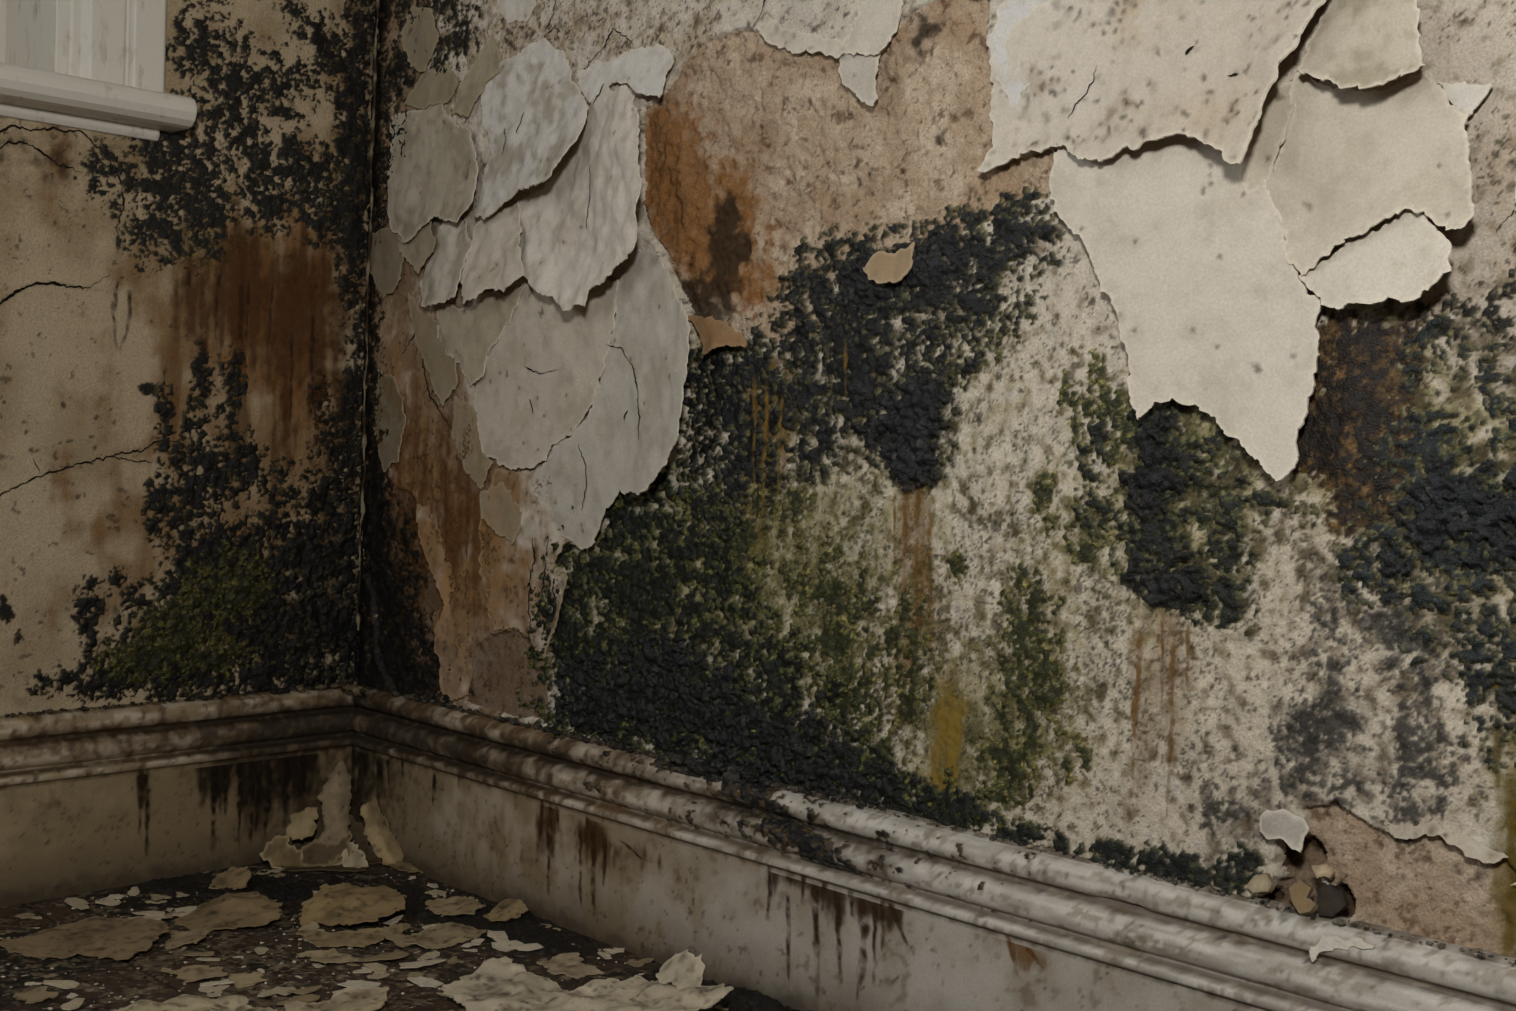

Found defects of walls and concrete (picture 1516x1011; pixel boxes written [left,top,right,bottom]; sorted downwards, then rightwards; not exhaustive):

crack [0,124,125,305]
water stain [26,0,490,706]
peeling [370,0,1494,719]
water stain [0,594,24,645]
water stain [514,186,1516,956]
water stain [767,867,907,981]
flaking render [1246,804,1516,962]